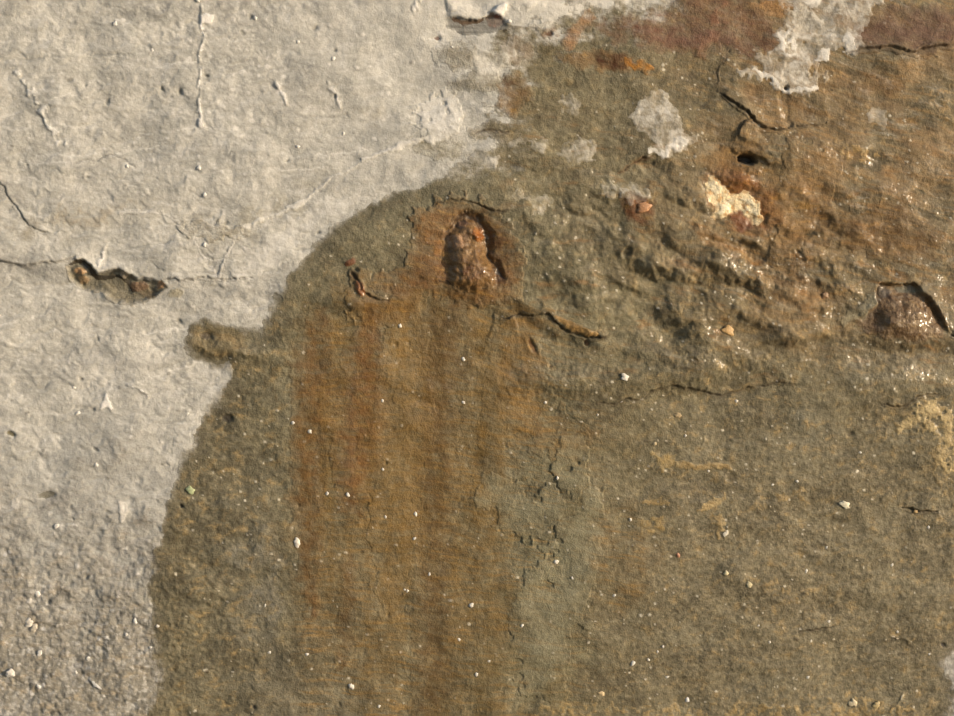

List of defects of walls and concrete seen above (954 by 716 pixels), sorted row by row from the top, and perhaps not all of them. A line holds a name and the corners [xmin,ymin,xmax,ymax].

spalling [444,3,507,36]
water stain [736,0,885,97]
crack [846,37,954,59]
efflorescence [627,89,700,160]
crack [713,48,836,139]
spalling [703,175,764,233]
spalling [65,258,169,307]
crack [118,208,252,283]
crack [492,310,611,343]
corrosion [257,189,605,716]
water stain [240,521,362,716]
water stain [507,485,607,698]